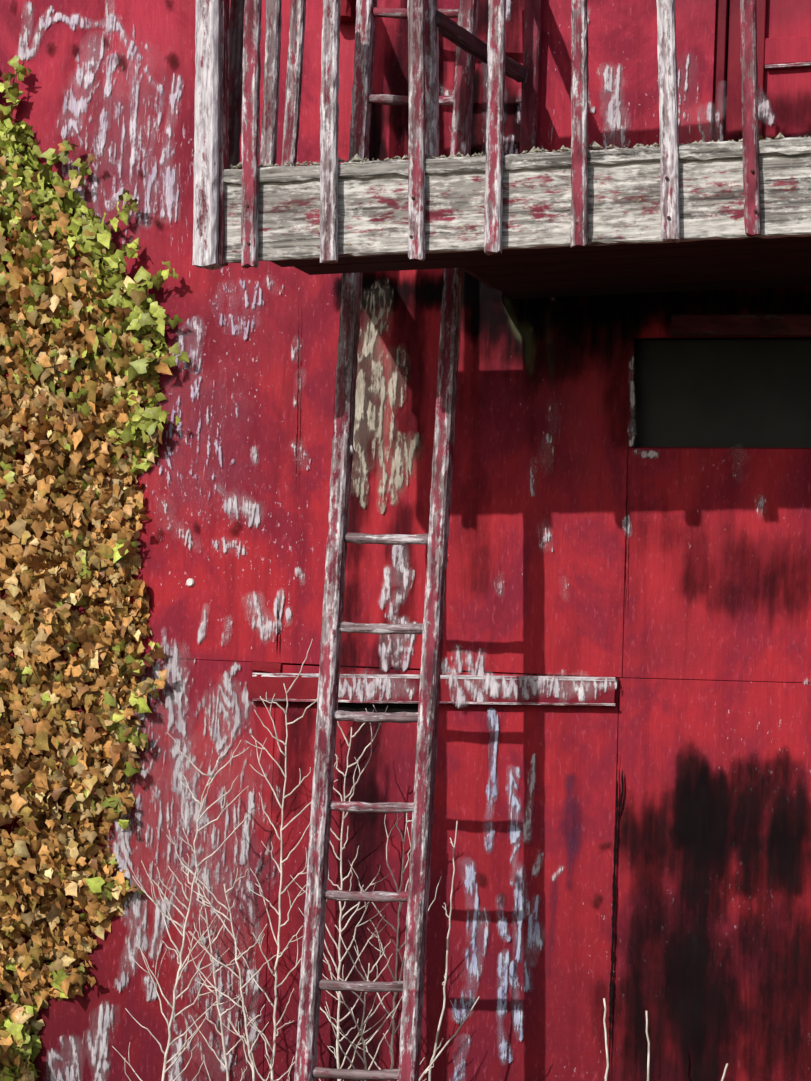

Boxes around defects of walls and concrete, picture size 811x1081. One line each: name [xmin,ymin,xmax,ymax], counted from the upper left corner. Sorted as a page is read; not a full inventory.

peeling [18,2,183,225]
peeling [590,65,629,149]
peeling [352,279,419,514]
peeling [198,610,208,643]
peeling [247,591,291,642]
peeling [108,637,280,1081]
peeling [441,645,617,1063]
damp [623,751,811,1081]
peeling [48,1004,113,1081]